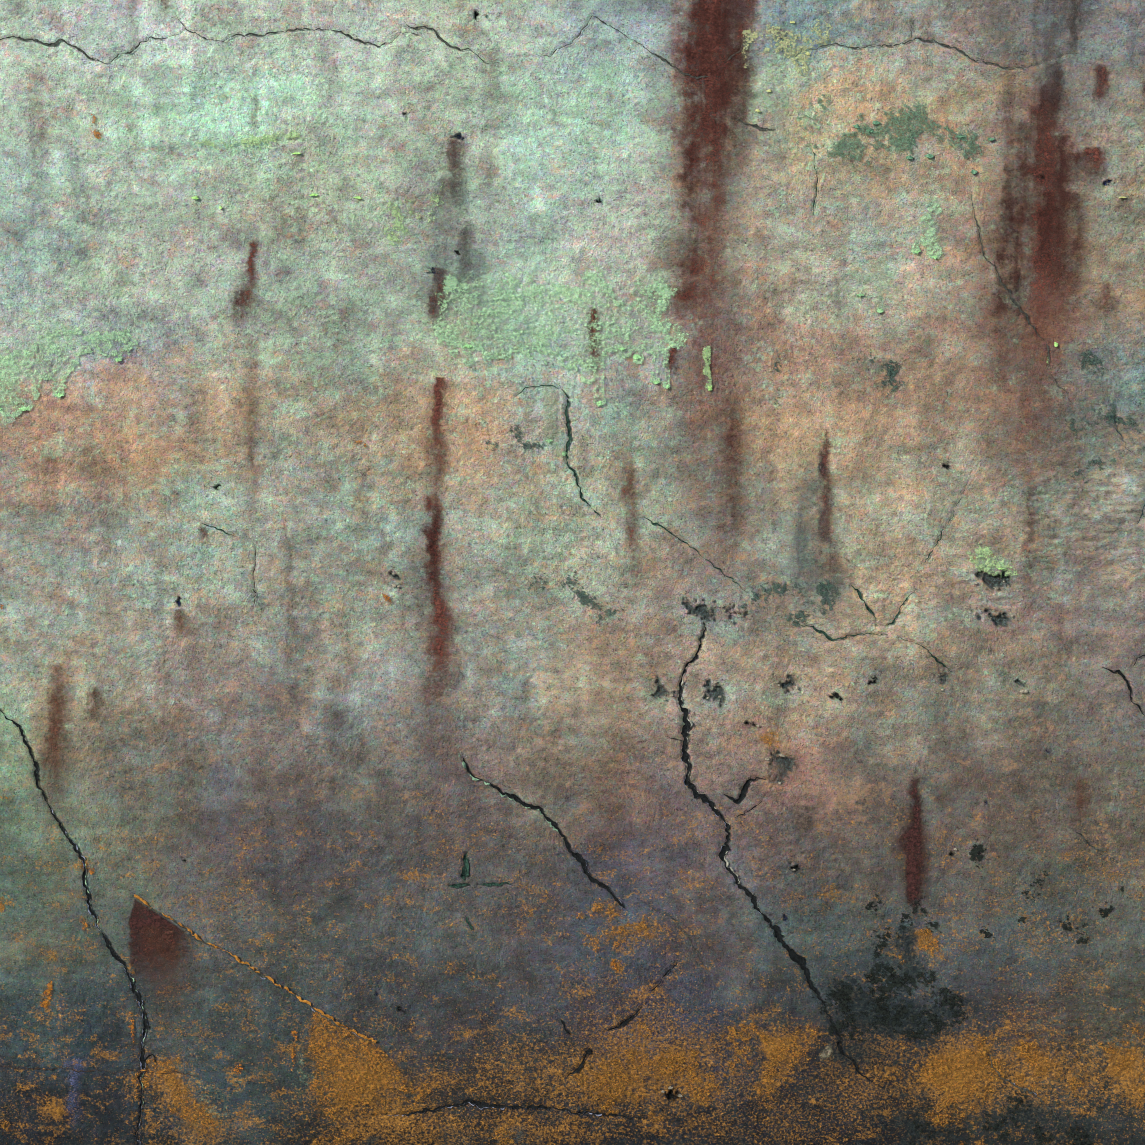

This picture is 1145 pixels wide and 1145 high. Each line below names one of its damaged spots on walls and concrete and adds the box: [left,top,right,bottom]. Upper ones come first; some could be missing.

crack [0,15,498,64]
peeling [0,324,138,419]
peeling [424,257,689,407]
rust [670,0,757,387]
rust [998,65,1104,363]
rust [422,377,453,698]
crack [0,710,217,1145]
water stain [291,1012,431,1145]
crack [449,753,711,1078]
water stain [573,1017,816,1121]
crack [667,612,883,1088]
water stain [913,1036,1057,1127]